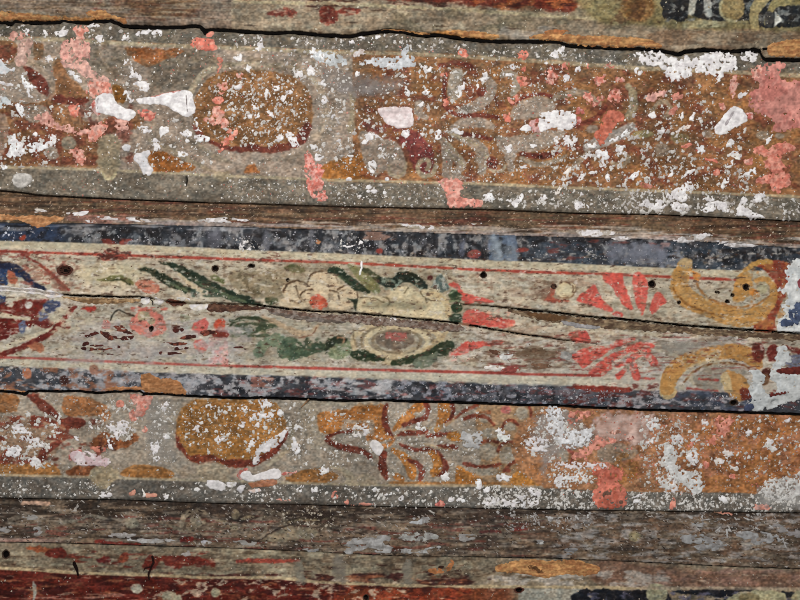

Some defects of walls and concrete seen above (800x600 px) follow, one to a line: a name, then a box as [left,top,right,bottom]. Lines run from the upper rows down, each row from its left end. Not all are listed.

crack [0,20,800,62]
peeling [0,10,800,222]
crack [63,294,153,305]
peeling [777,258,800,334]
peeling [159,326,216,355]
crack [257,304,799,344]
crack [0,390,800,415]
peeling [68,345,800,554]
peeling [22,515,43,536]